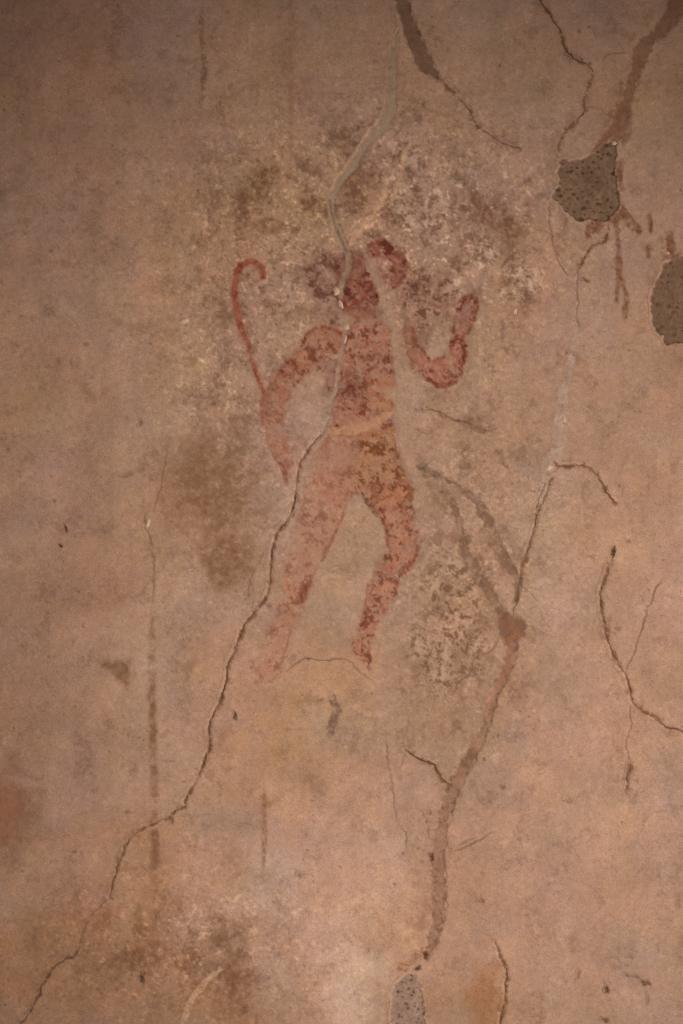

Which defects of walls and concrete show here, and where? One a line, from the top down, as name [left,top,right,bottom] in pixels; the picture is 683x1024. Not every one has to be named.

crack [436,76,524,152]
crack [536,0,631,161]
spalling [549,135,623,226]
crack [541,205,614,331]
spalling [648,251,683,349]
crack [512,458,621,615]
crack [16,430,326,1024]
crack [286,657,372,681]
crack [595,557,683,797]
crack [386,742,454,850]
spalling [388,947,431,1024]
crack [492,938,513,1024]